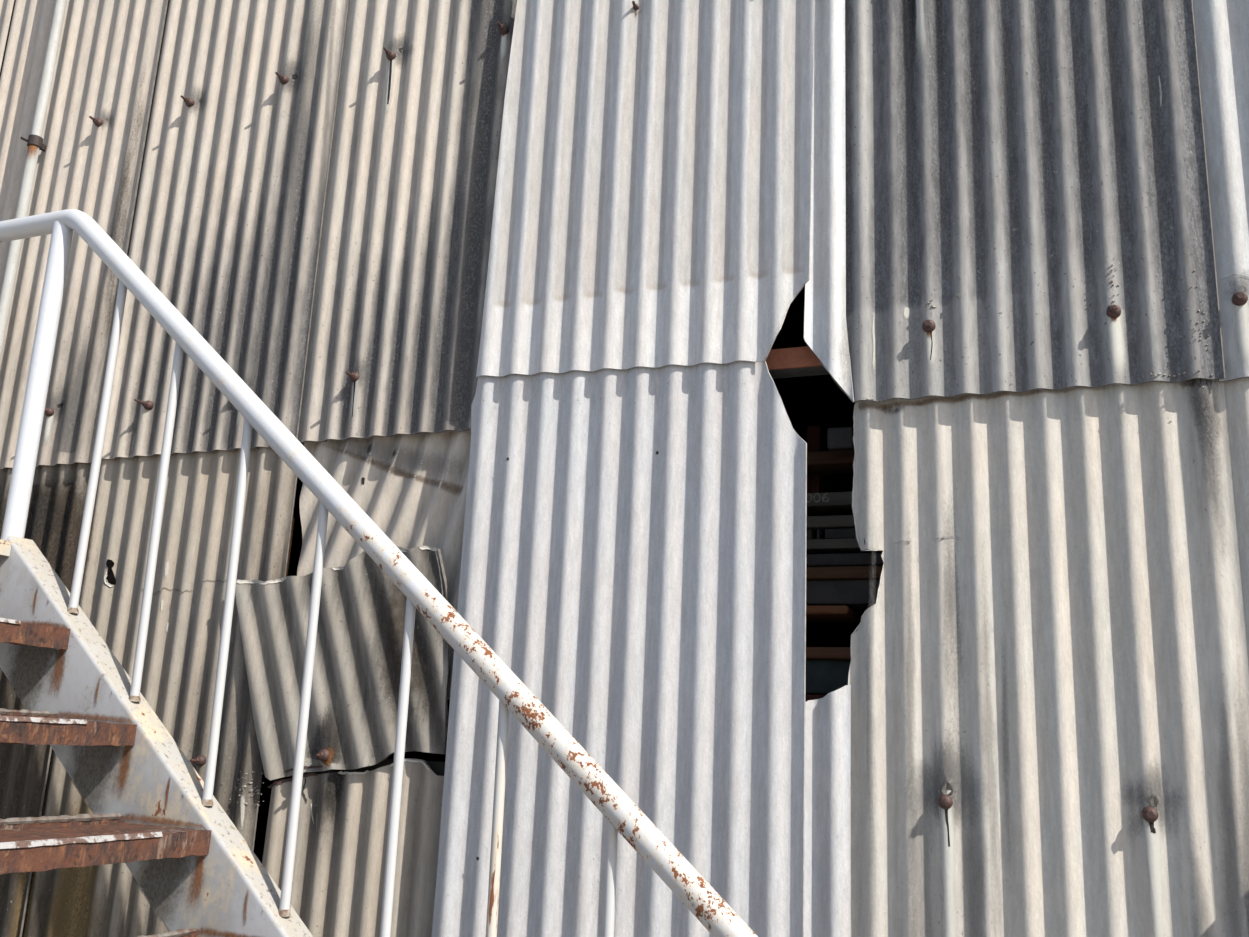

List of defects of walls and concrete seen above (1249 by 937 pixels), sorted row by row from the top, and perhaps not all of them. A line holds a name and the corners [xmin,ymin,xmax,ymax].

leakage [435,0,514,429]
leakage [341,241,463,493]
spalling [764,285,803,359]
leakage [1107,309,1125,373]
spalling [852,411,878,551]
corrosion [83,492,97,583]
spalling [851,565,884,660]
corrosion [10,645,65,710]
corrosion [70,745,132,811]
crack [267,759,430,803]
corrosion [138,855,204,921]
leakage [920,753,973,937]